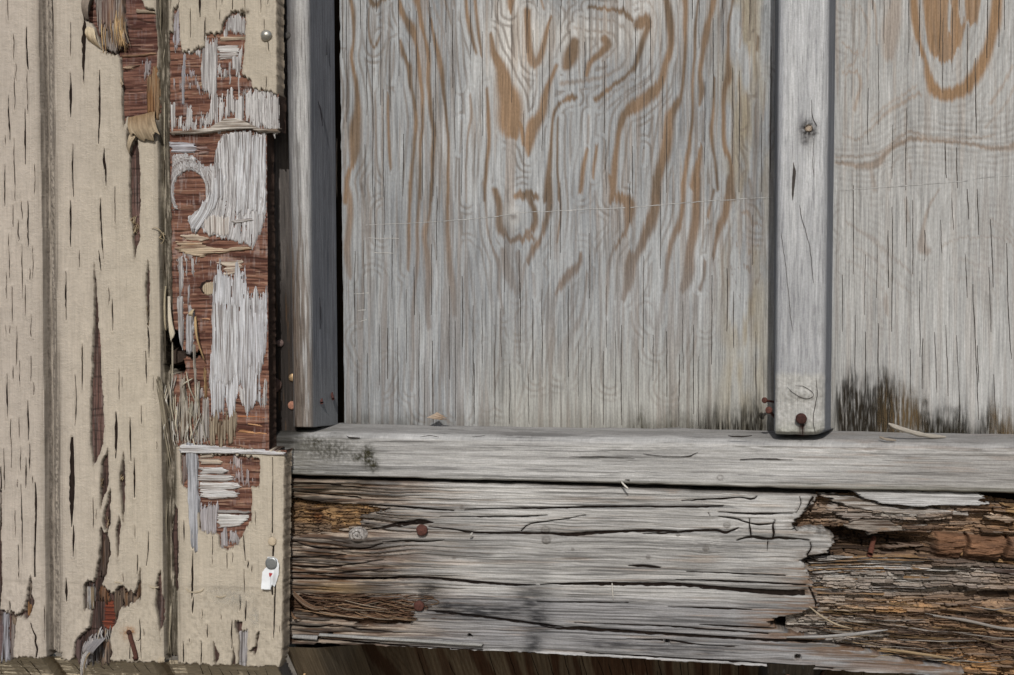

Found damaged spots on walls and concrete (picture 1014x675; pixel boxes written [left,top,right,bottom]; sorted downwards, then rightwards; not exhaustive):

crack [872,0,1005,133]
crack [0,27,37,608]
peeling [81,0,288,553]
crack [52,0,833,675]
water stain [836,374,1014,434]
crack [842,52,1012,420]
spalling [0,583,35,664]
crack [0,580,68,675]
spalling [75,529,158,675]